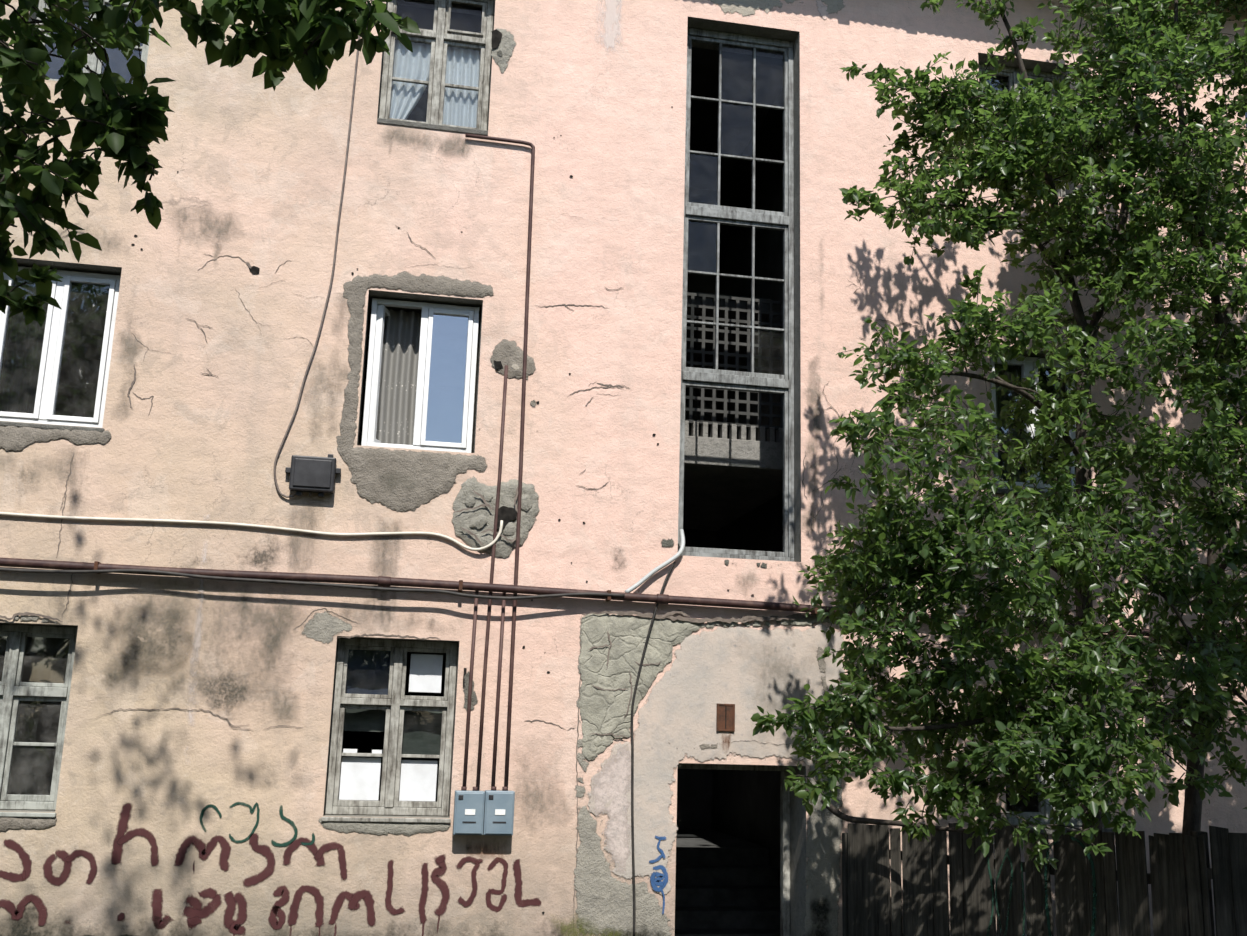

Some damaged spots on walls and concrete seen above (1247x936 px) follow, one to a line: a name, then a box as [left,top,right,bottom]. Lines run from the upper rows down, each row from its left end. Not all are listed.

peeling [711,0,844,20]
crack [238,260,318,343]
crack [534,287,621,310]
crack [187,318,218,377]
crack [127,332,166,414]
crack [570,381,629,406]
peeling [302,610,352,644]
damp [207,675,247,707]
crack [95,708,304,730]
peeling [573,613,845,936]
damp [807,899,831,936]